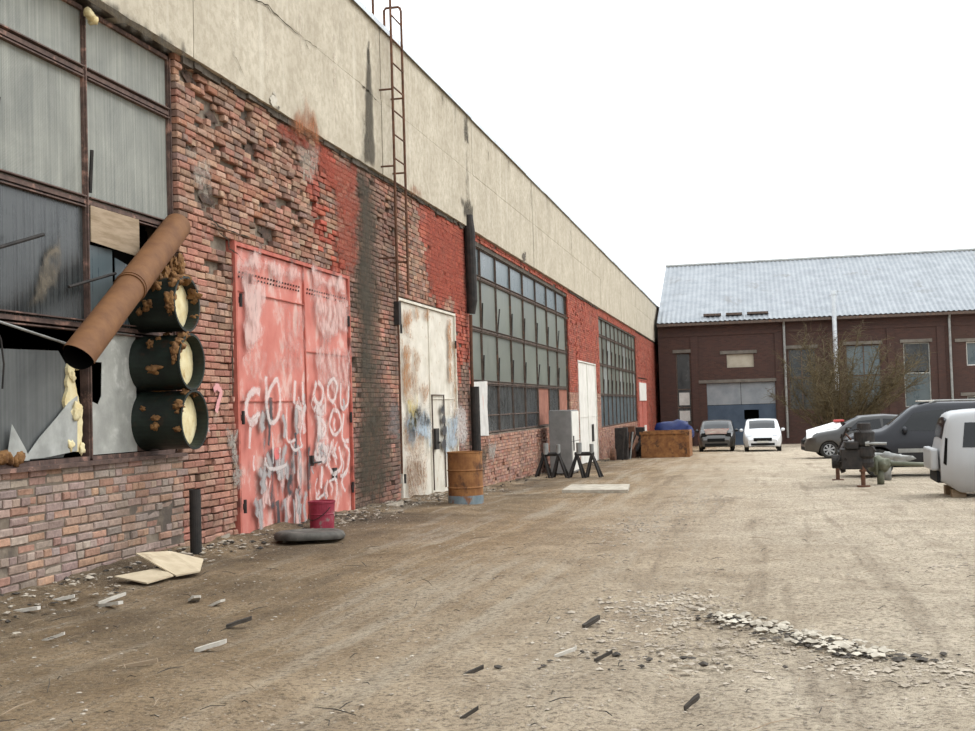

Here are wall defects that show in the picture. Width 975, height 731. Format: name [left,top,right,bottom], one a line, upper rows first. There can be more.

crack [244,0,316,47]
water stain [365,47,375,164]
water stain [356,177,392,499]